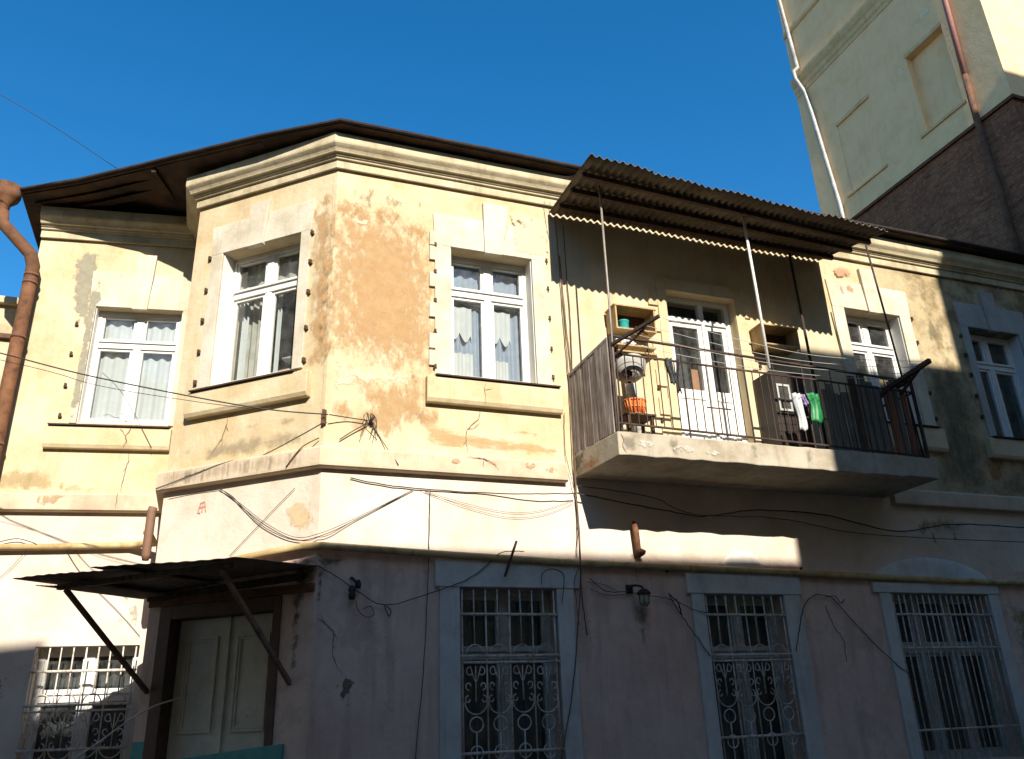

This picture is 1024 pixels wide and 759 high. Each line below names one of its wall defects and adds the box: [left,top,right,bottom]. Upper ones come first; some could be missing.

peeling [834,266,853,294]
peeling [71,253,101,408]
peeling [310,196,557,472]
crack [115,428,131,507]
crack [463,384,498,468]
spalling [336,678,354,698]